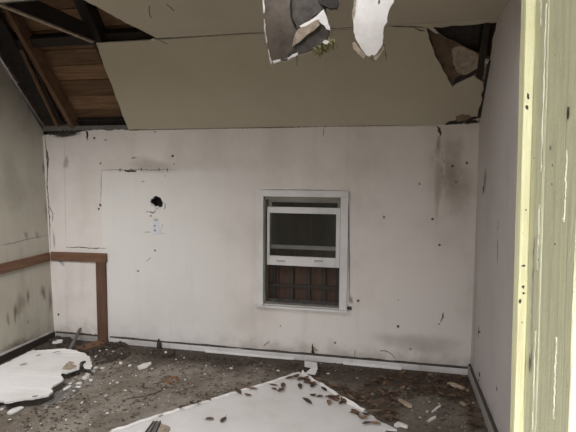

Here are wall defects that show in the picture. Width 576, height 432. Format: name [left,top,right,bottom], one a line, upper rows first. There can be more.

spalling [150,196,164,217]